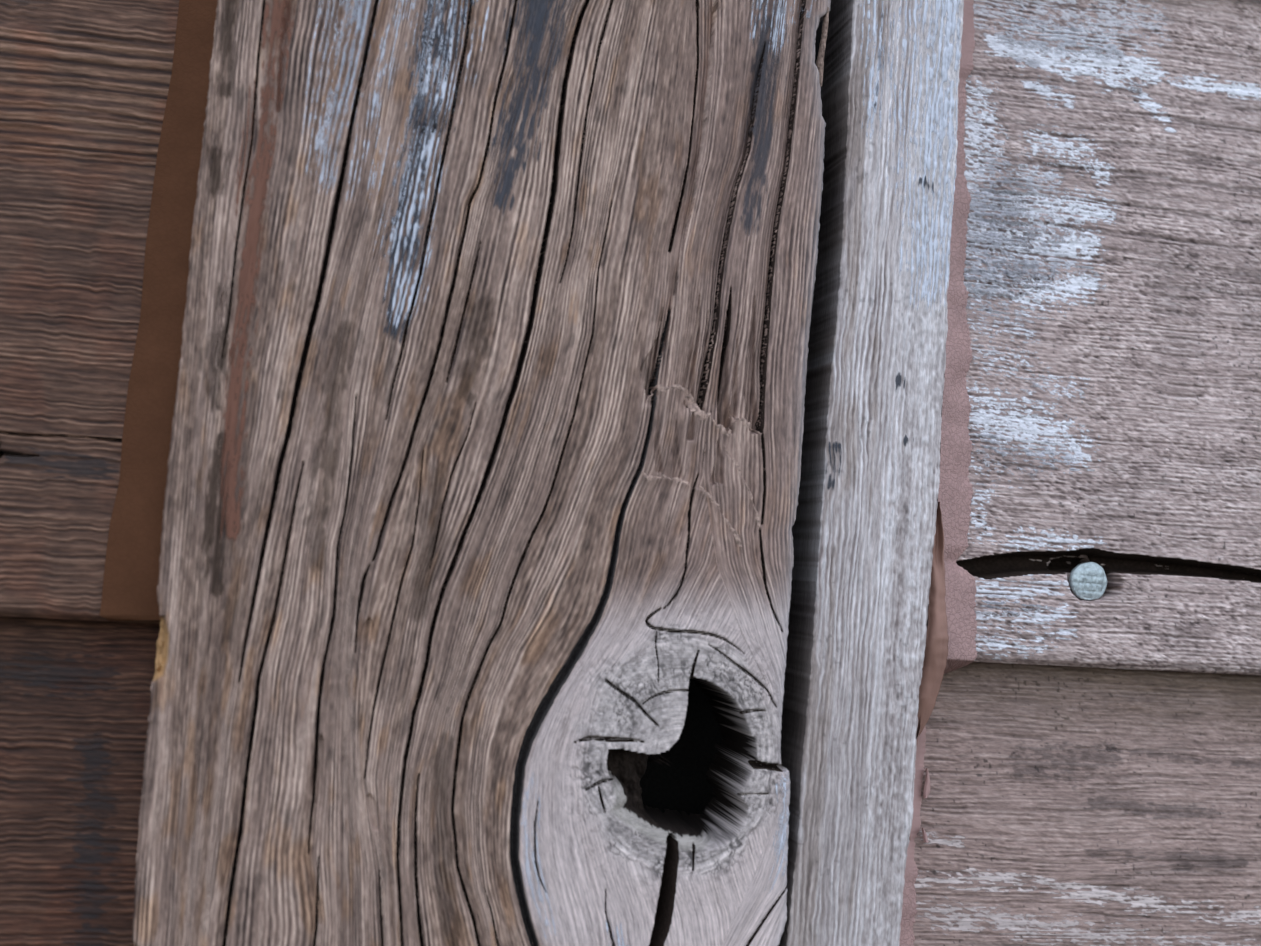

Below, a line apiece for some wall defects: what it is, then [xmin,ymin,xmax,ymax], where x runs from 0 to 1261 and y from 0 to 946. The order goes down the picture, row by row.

crack [668,0,699,252]
crack [697,43,766,410]
crack [755,0,806,631]
crack [308,0,613,946]
crack [451,202,671,946]
crack [574,474,777,743]
crack [956,548,1261,583]
crack [649,834,695,946]
crack [737,759,783,795]
crack [746,885,787,946]